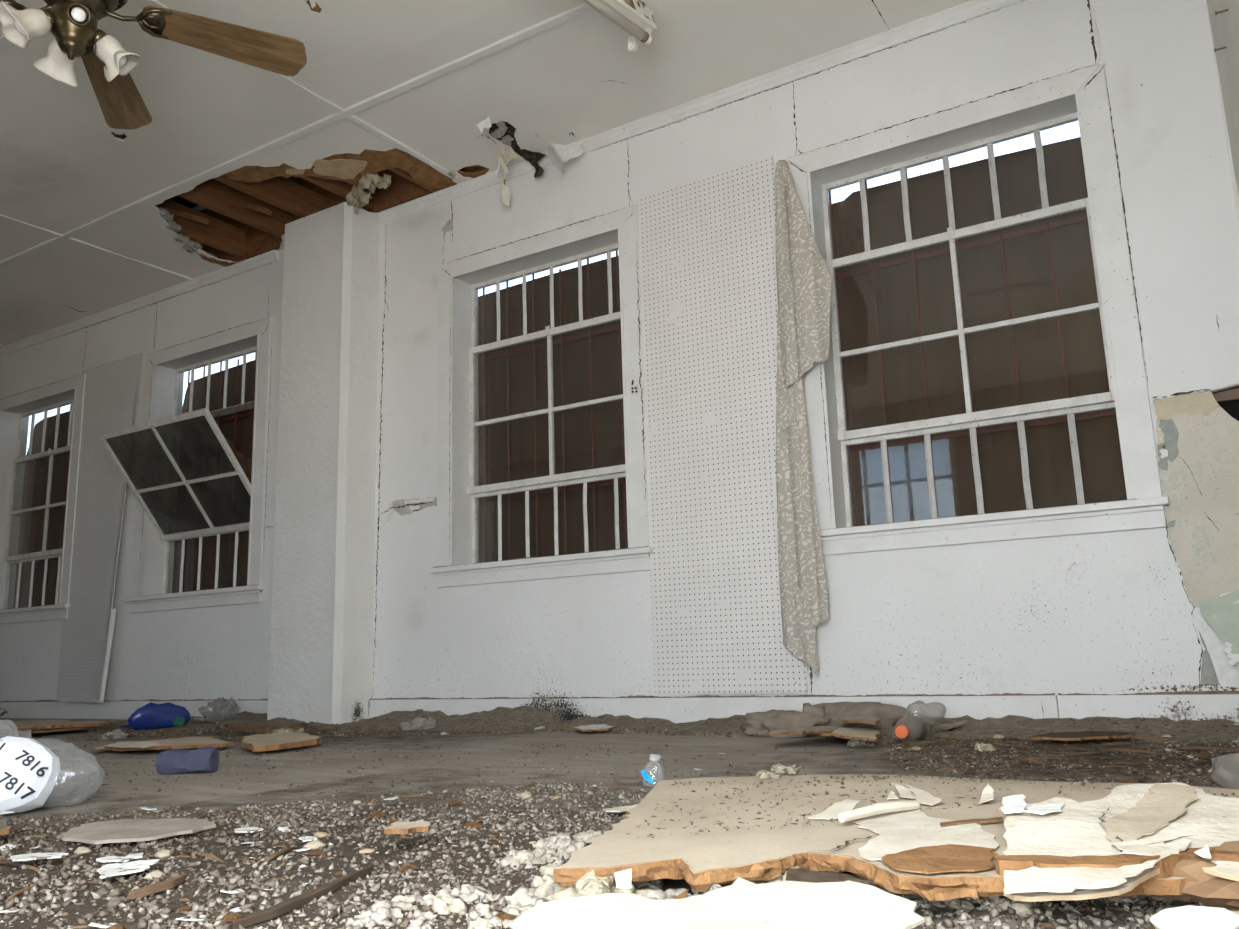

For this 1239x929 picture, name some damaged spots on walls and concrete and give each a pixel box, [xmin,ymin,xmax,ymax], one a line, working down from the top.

peeling [1150,384,1239,608]